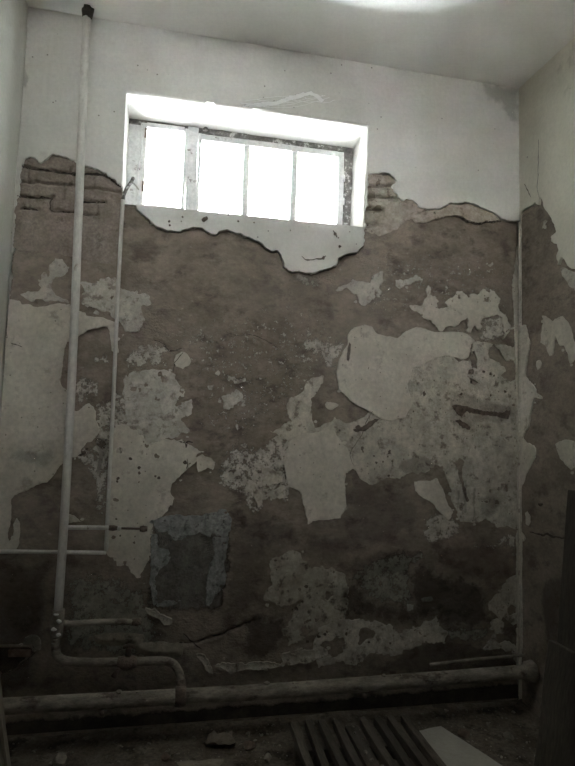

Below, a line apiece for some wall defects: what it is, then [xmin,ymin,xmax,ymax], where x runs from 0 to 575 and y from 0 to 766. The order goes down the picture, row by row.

crack [179,621,251,649]
flaking render [0,155,575,724]